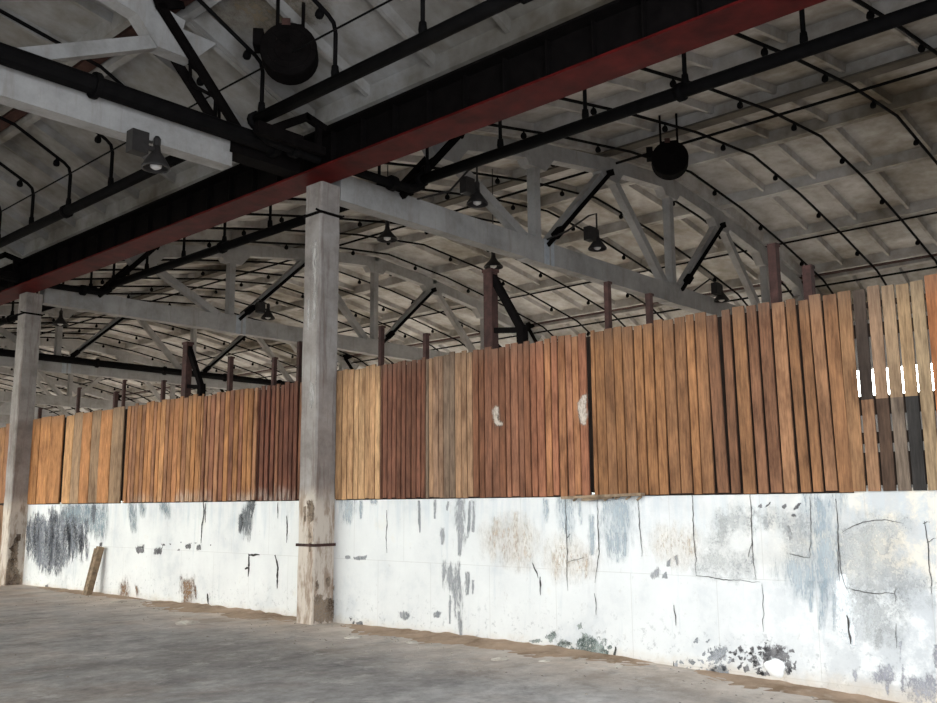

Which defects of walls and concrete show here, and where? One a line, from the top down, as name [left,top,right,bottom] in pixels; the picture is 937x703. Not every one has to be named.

damp [26,504,106,574]
damp [559,499,594,555]
damp [603,498,629,562]
damp [783,501,924,649]
crack [835,499,899,601]
crack [923,521,934,593]
peeling [529,624,612,654]
spalling [674,638,796,676]
damp [874,645,937,703]